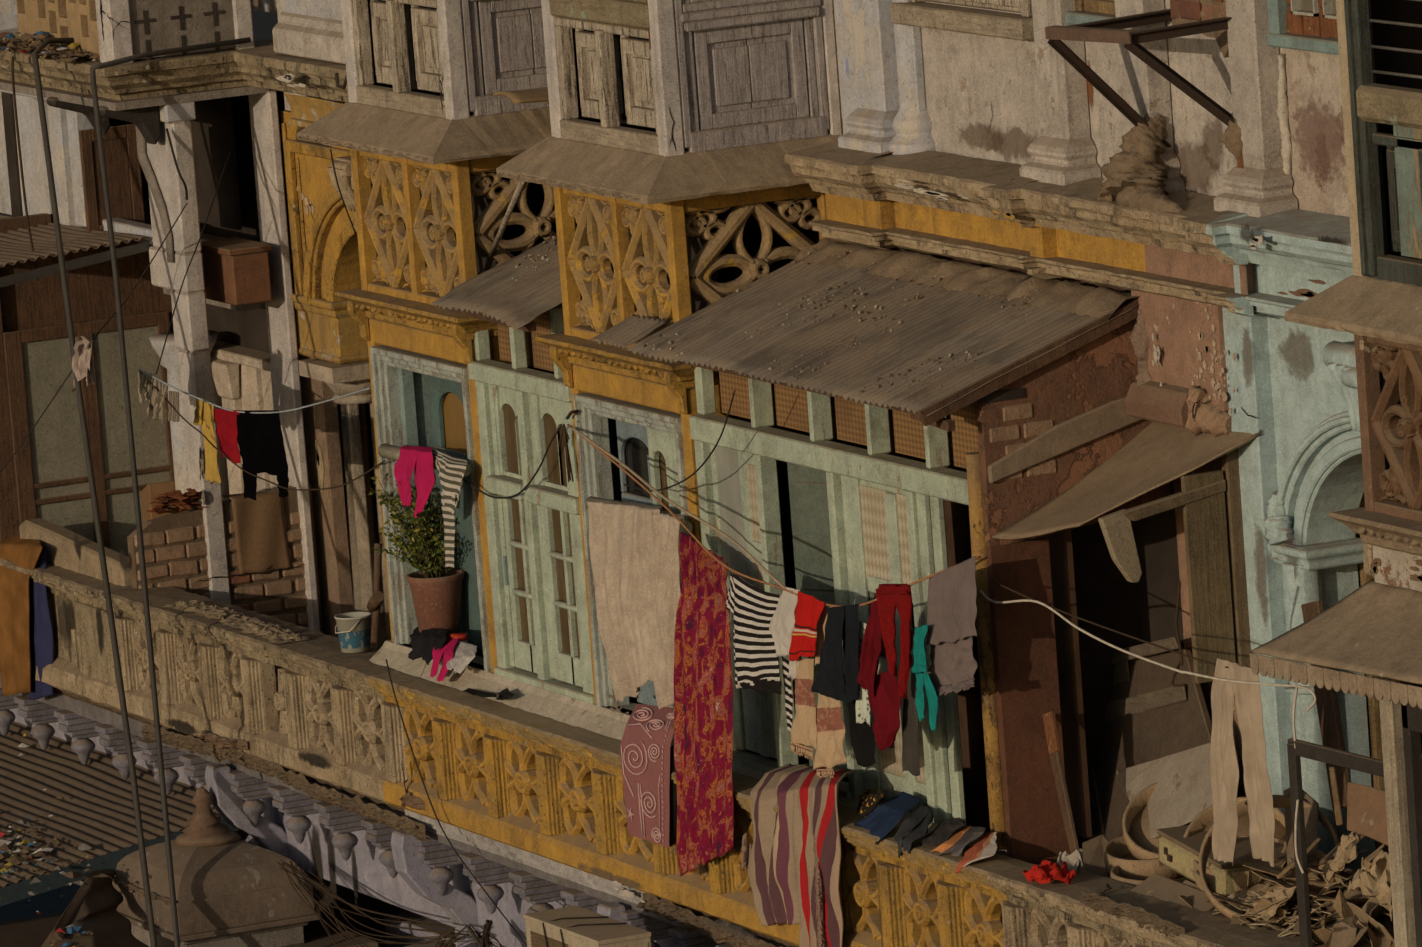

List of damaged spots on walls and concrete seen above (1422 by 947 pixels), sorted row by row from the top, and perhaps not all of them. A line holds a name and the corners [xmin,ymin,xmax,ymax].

peeling [1152,333,1162,386]
spalling [1185,307,1236,437]
peeling [1370,558,1381,574]
peeling [1409,560,1422,582]